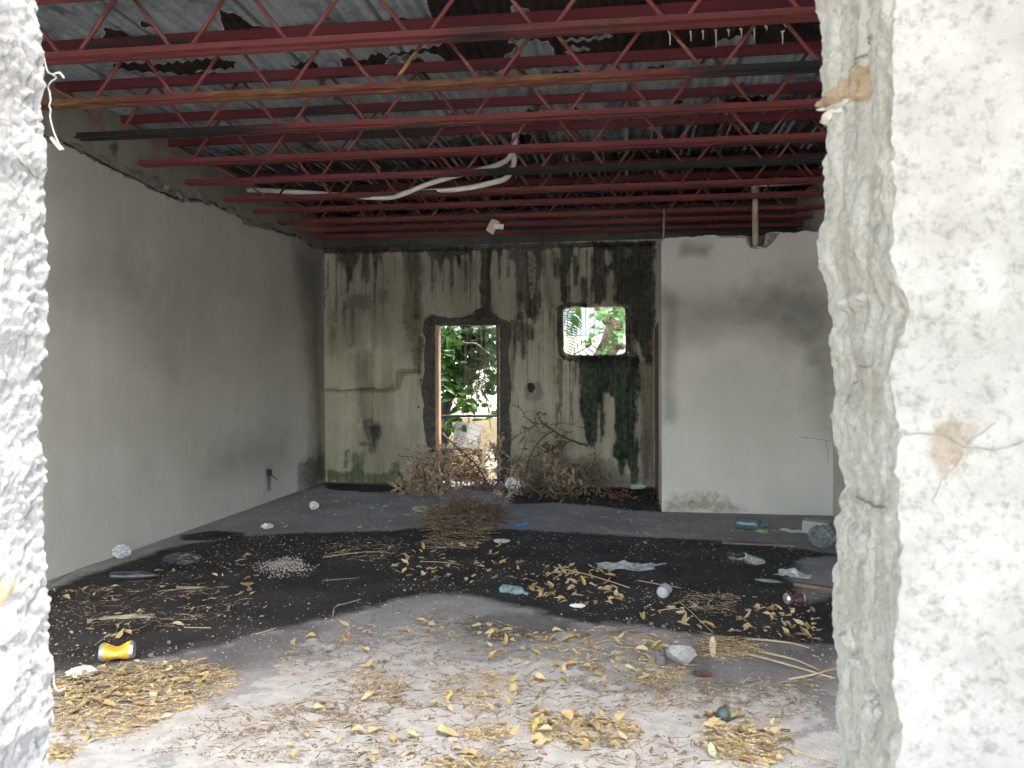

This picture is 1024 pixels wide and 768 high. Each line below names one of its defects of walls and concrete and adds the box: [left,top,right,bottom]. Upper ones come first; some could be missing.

peeling [44,133,314,250]
damp [335,252,383,289]
damp [402,246,555,367]
damp [557,243,656,413]
damp [344,451,364,474]
crack [901,422,1024,508]